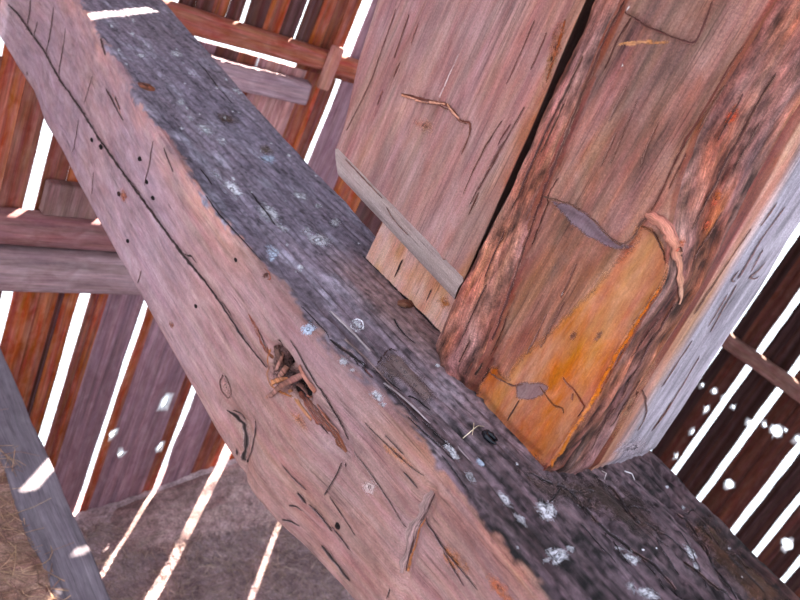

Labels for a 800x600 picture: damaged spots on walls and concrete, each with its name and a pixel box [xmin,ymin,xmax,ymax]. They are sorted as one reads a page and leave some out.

crack [8,4,267,368]
crack [250,192,275,225]
crack [459,1,631,379]
peeling [477,196,685,467]